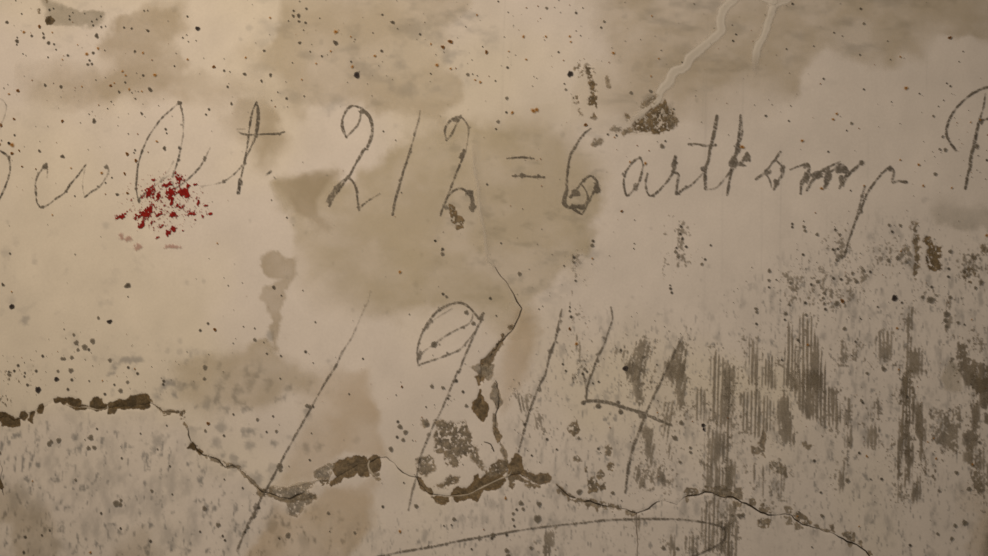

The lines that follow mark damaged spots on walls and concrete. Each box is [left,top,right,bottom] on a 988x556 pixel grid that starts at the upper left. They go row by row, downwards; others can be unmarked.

crack [636,0,738,118]
crack [752,0,791,60]
spalling [611,89,678,148]
crack [0,206,658,533]
spalling [416,420,485,488]
crack [684,485,872,556]